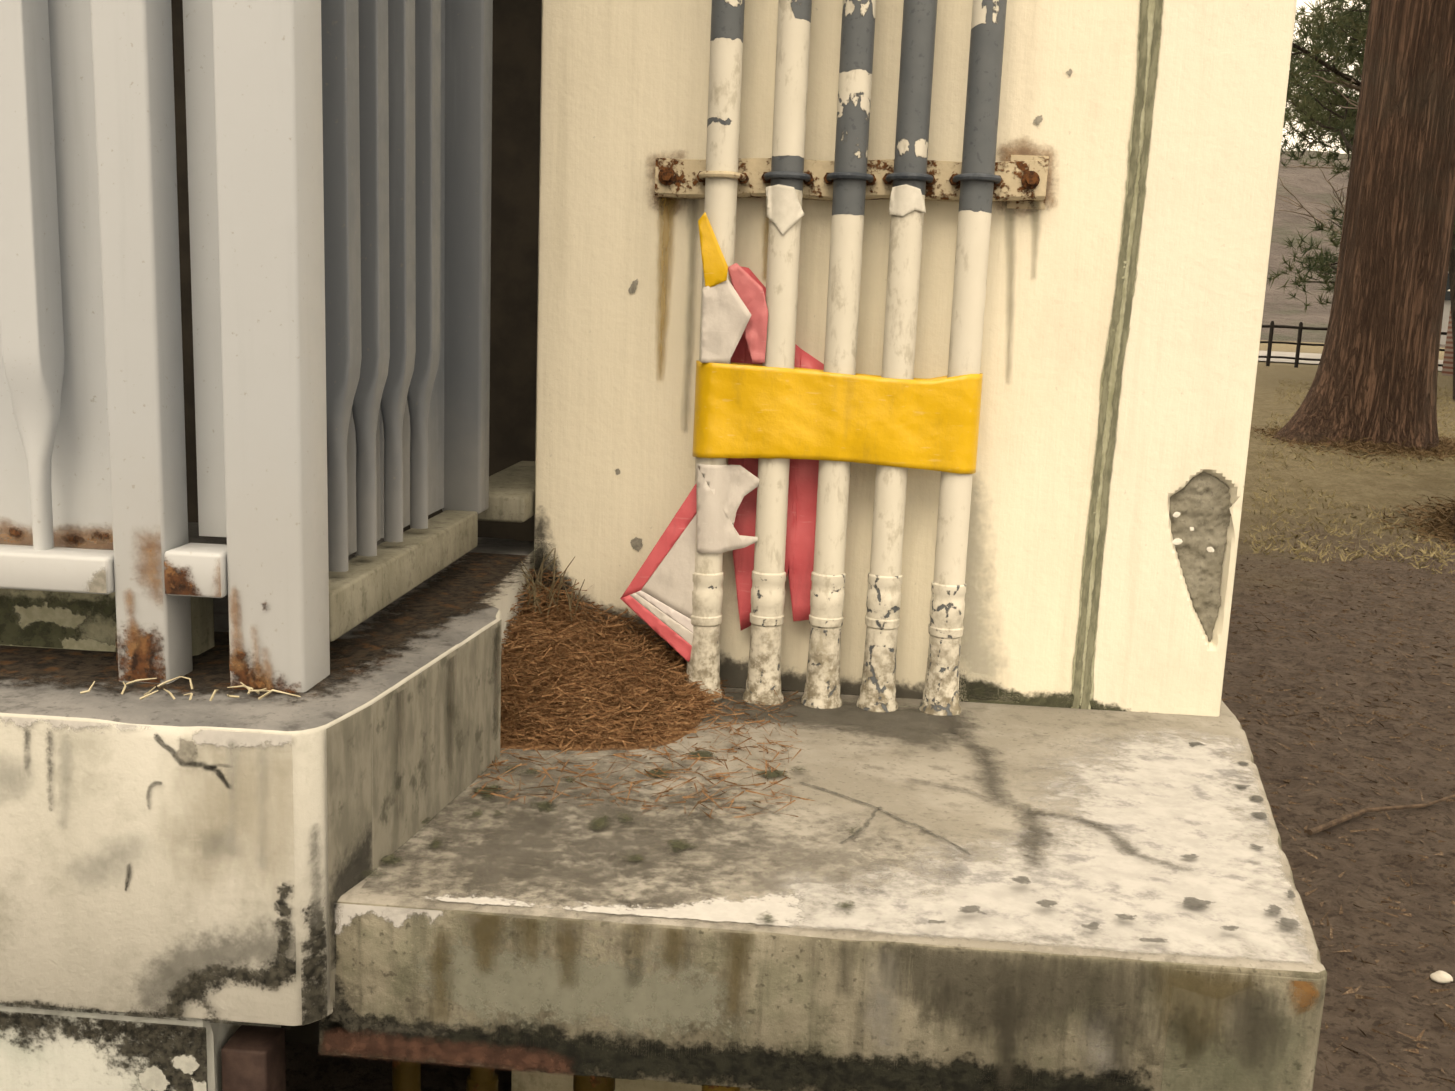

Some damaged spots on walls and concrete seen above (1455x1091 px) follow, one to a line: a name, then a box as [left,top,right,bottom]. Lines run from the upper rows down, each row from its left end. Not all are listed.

corrosion [653,191,682,373]
corrosion [0,522,33,546]
corrosion [53,527,113,550]
corrosion [141,537,200,596]
spalling [1169,472,1232,642]
corrosion [115,593,166,683]
crack [146,734,232,809]
water stain [139,619,502,1041]
crack [800,782,968,853]
water stain [666,928,683,965]
water stain [728,932,750,1010]
water stain [878,945,1252,1081]